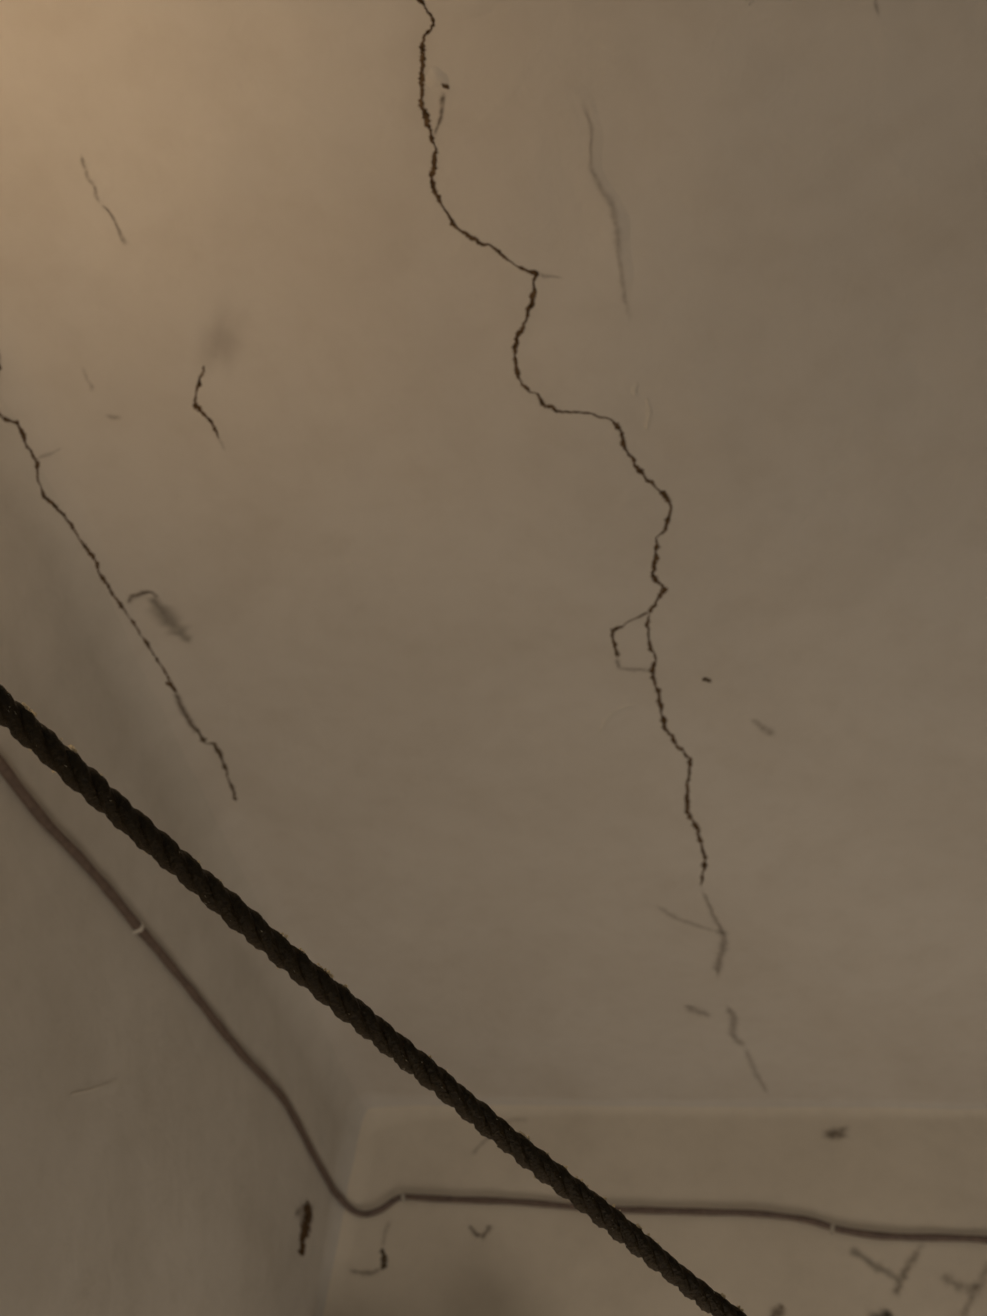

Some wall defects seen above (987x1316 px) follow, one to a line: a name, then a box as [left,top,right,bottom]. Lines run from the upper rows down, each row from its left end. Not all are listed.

crack [0,413,237,801]
crack [192,365,219,439]
crack [417,0,708,886]